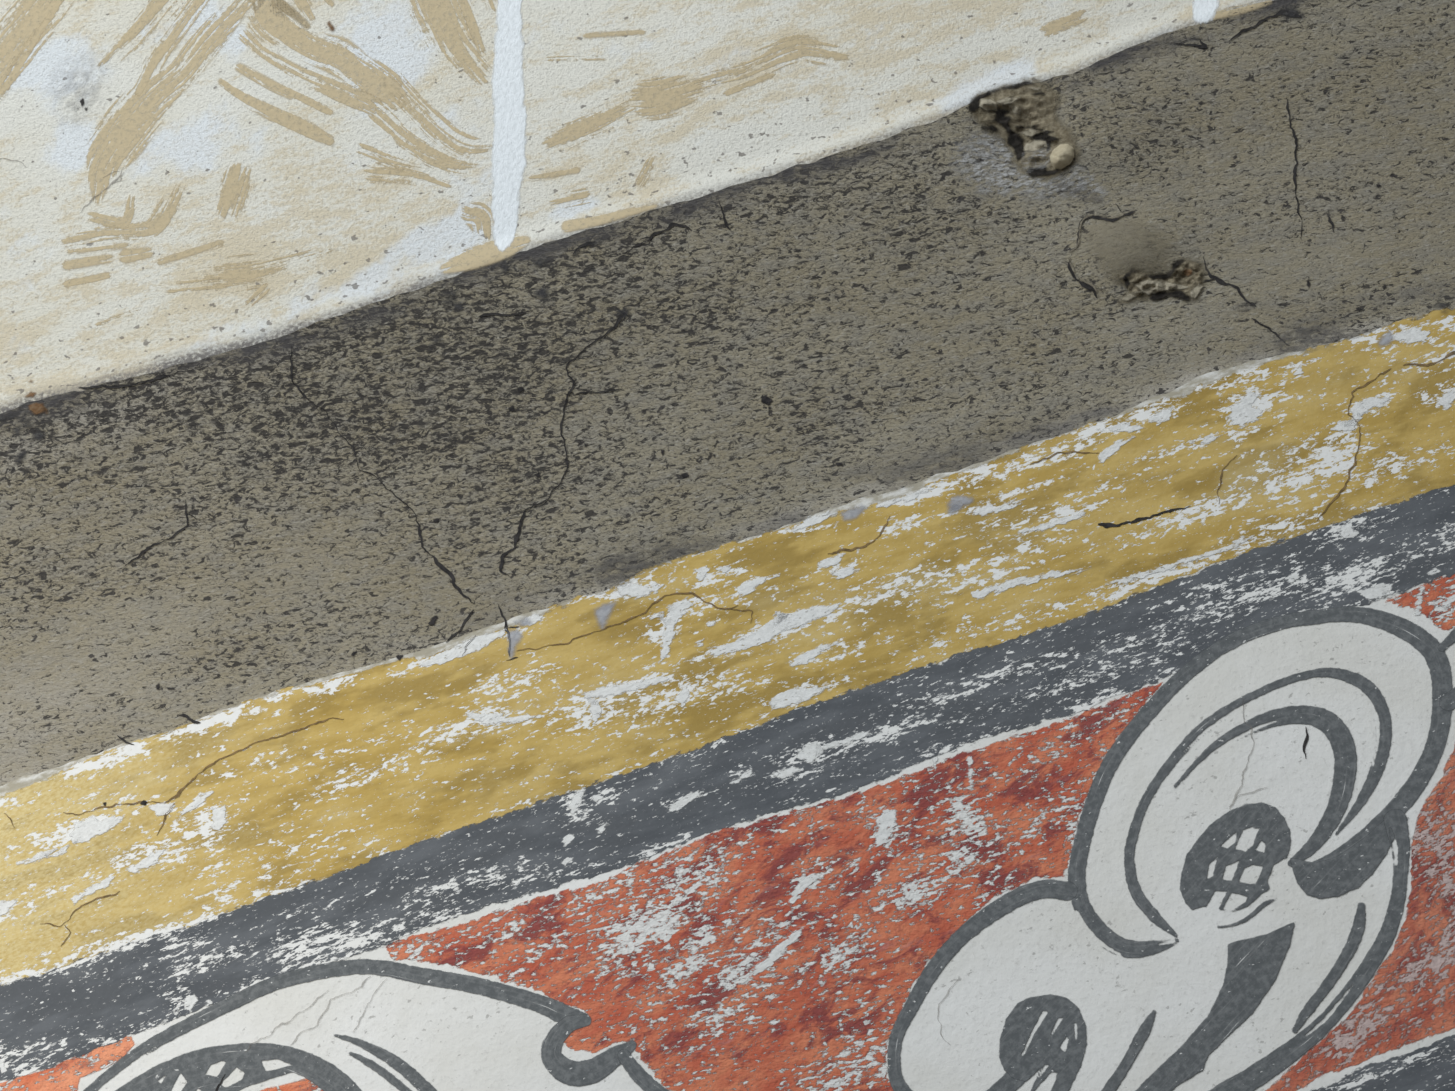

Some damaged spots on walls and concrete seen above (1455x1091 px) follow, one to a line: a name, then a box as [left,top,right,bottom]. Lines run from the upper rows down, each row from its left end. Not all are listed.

spalling [968,80,1079,178]
crack [1286,98,1334,240]
crack [1202,257,1288,345]
crack [290,309,753,660]
crack [1098,455,1237,528]
crack [1317,351,1455,520]
peeling [396,614,543,667]
peeling [582,581,693,724]
peeling [692,603,839,660]
crack [63,717,343,836]
peeling [773,731,877,781]
peeling [739,926,804,984]